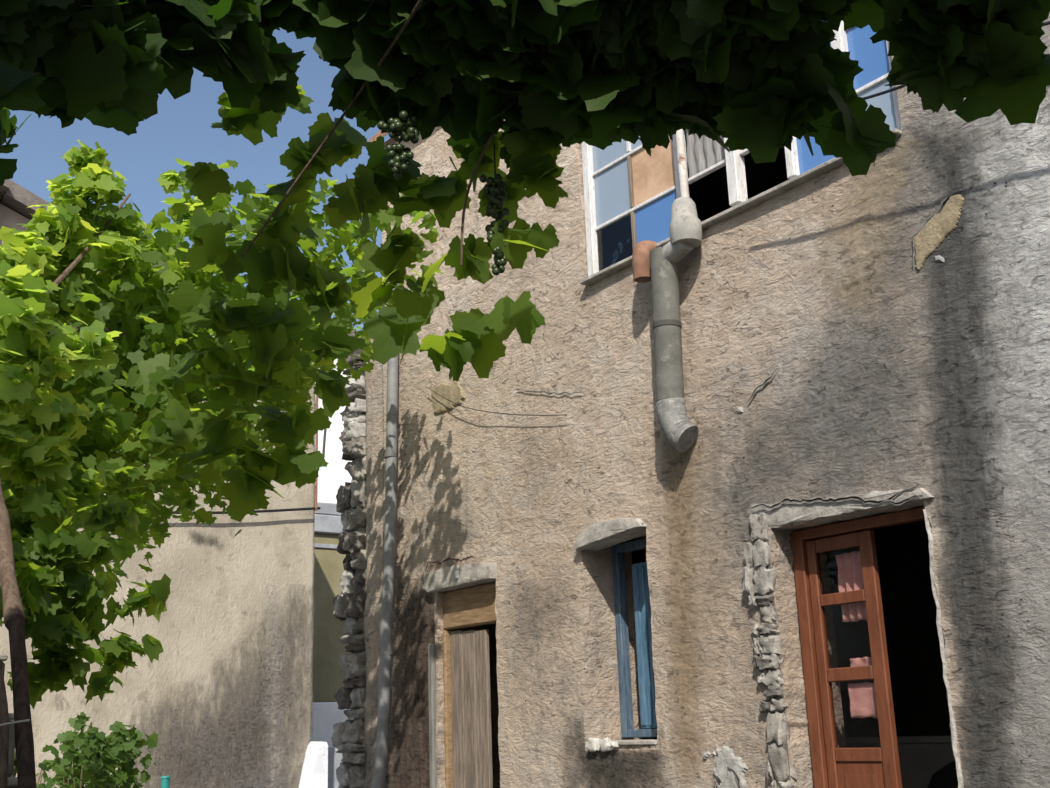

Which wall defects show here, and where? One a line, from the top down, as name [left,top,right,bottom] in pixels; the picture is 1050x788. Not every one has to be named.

peeling [912,190,964,271]
crack [748,484,922,509]
water stain [566,725,660,788]